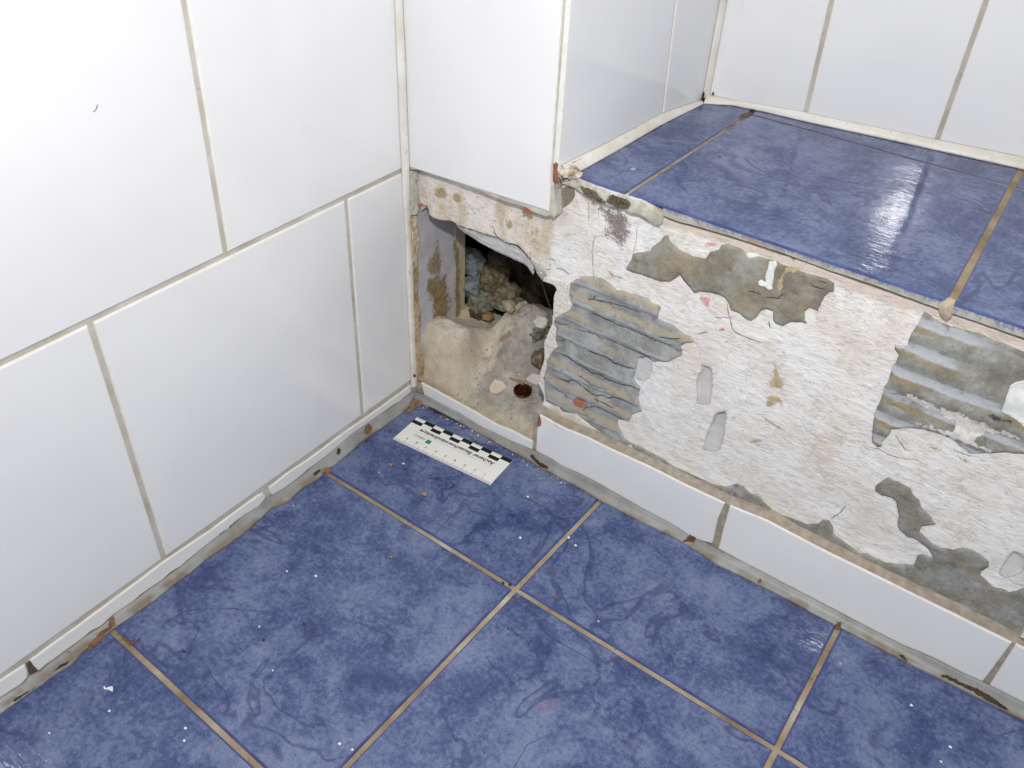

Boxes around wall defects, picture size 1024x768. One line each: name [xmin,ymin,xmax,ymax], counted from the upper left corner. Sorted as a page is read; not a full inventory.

flaking render [455,223,569,386]
spalling [635,358,652,381]
flaking render [490,379,507,395]
peeling [1002,381,1024,427]
spalling [999,551,1024,578]